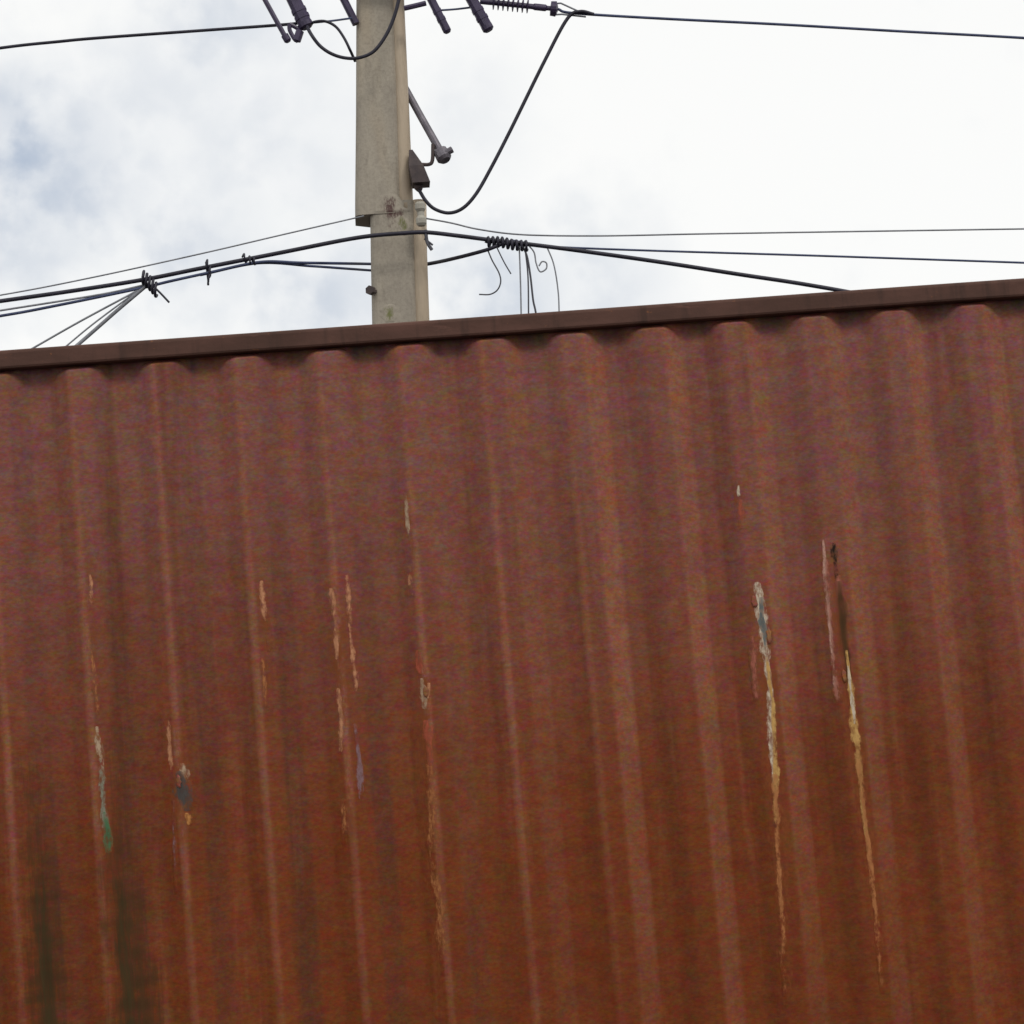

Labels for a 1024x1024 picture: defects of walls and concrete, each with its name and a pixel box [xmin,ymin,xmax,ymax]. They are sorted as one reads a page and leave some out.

peeling [154,702,206,895]
rust [740,574,803,1024]
rust [814,538,893,1009]